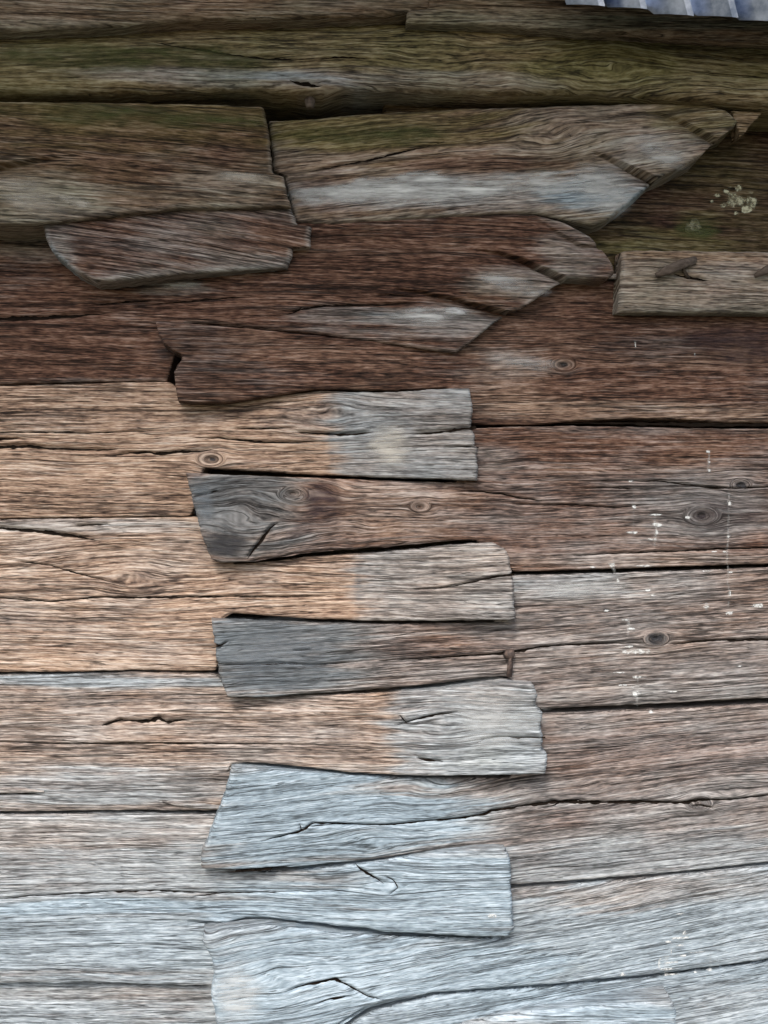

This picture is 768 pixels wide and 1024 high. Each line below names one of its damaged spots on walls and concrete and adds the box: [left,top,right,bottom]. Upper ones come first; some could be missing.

crack [247,523,277,559]
crack [8,717,311,745]
crack [264,795,766,841]
crack [356,864,398,894]